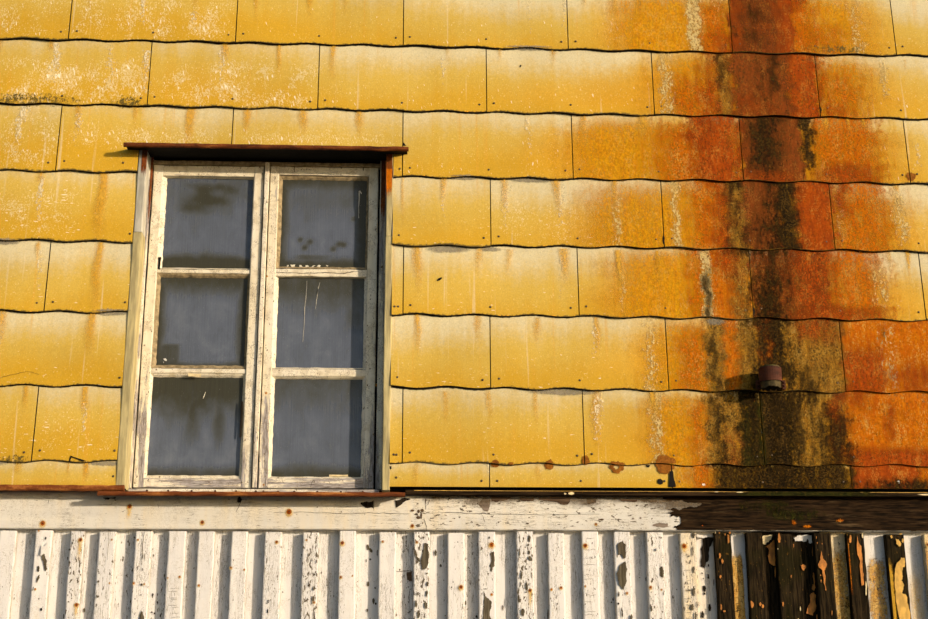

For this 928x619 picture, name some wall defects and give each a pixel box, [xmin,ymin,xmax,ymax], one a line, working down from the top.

damp [683,0,704,51]
damp [657,53,674,113]
damp [714,53,733,115]
damp [670,181,683,247]
corrosion [573,0,928,489]
damp [699,117,928,489]
damp [642,317,666,463]
peeling [395,490,574,519]
peeling [619,491,928,619]